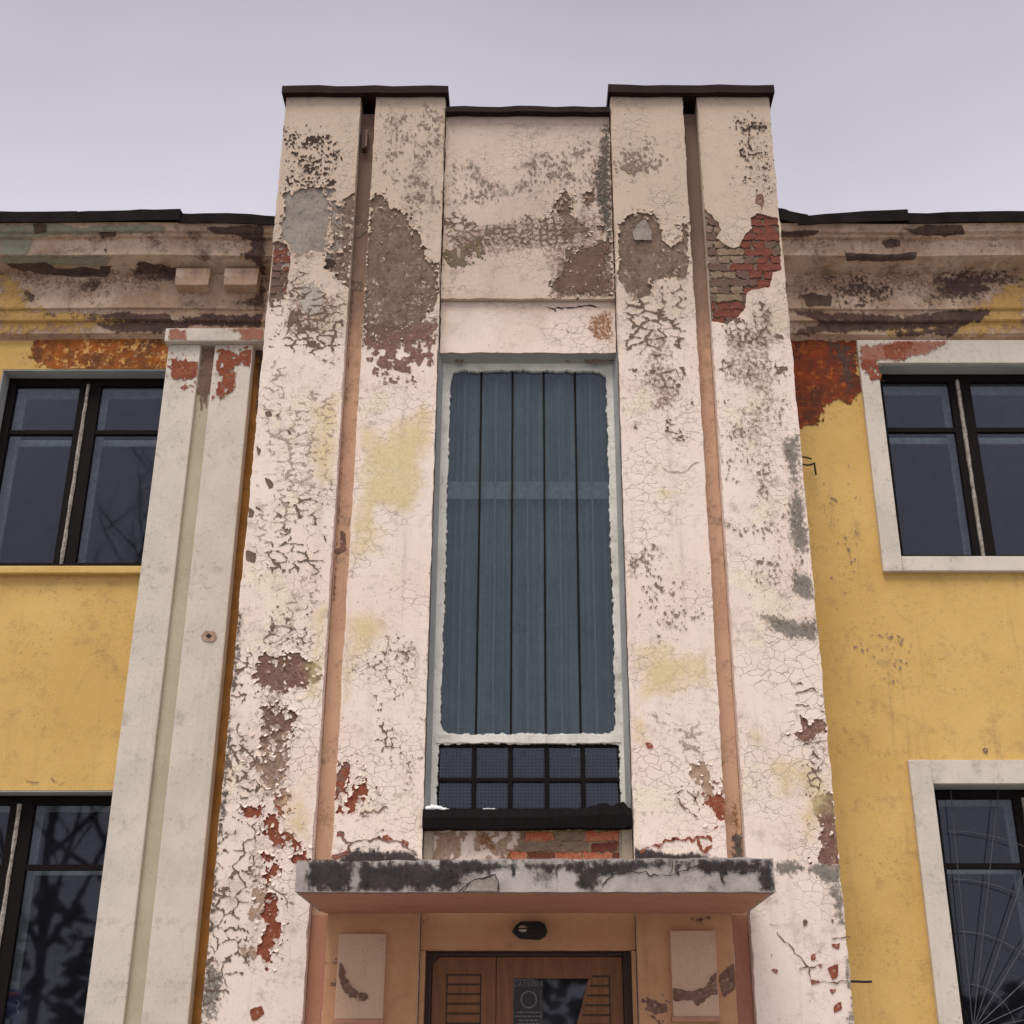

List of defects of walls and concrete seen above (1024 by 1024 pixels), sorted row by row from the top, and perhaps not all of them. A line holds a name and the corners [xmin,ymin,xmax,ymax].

water stain [0,223,165,266]
spalling [207,178,494,388]
crack [716,291,790,395]
peeling [704,194,819,324]
water stain [781,434,809,554]
peeling [718,340,923,614]
crack [203,256,346,1022]
water stain [760,613,818,640]
peeling [236,640,325,971]
crack [579,686,754,888]
crack [790,680,830,794]
water stain [305,833,845,925]